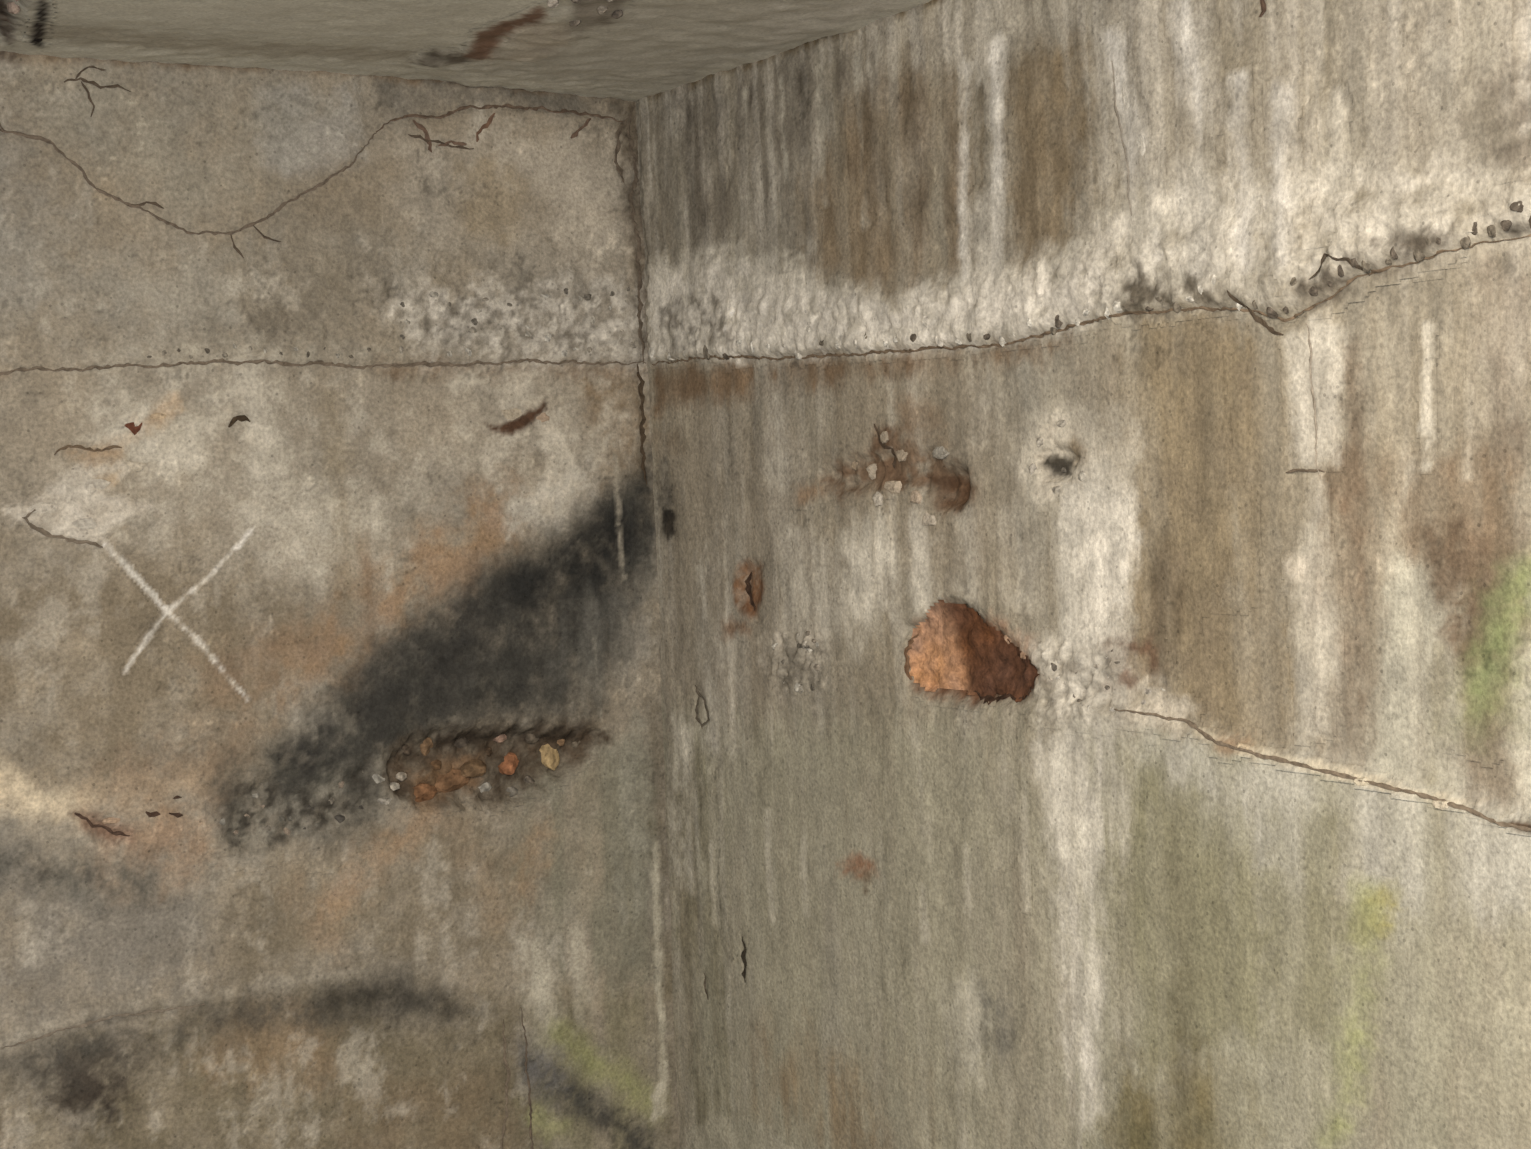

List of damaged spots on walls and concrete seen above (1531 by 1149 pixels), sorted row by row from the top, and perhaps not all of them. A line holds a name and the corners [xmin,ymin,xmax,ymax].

crack [64,66,131,117]
leakage [53,261,649,626]
rust [716,556,769,646]
crack [0,103,1531,485]
spalling [788,382,985,527]
leakage [644,0,1531,1149]
spalling [206,710,617,869]
leakage [510,534,740,1131]